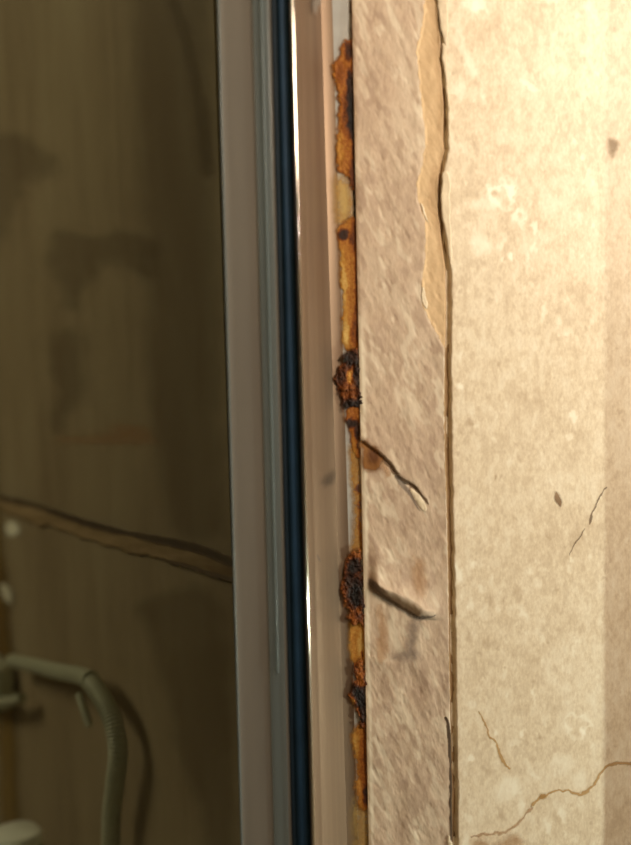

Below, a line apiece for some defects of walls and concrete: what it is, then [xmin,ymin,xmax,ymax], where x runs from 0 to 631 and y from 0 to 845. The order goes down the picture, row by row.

spalling [416,0,452,349]
rust [331,0,384,845]
crack [364,441,429,512]
crack [569,487,607,555]
crack [369,580,435,619]